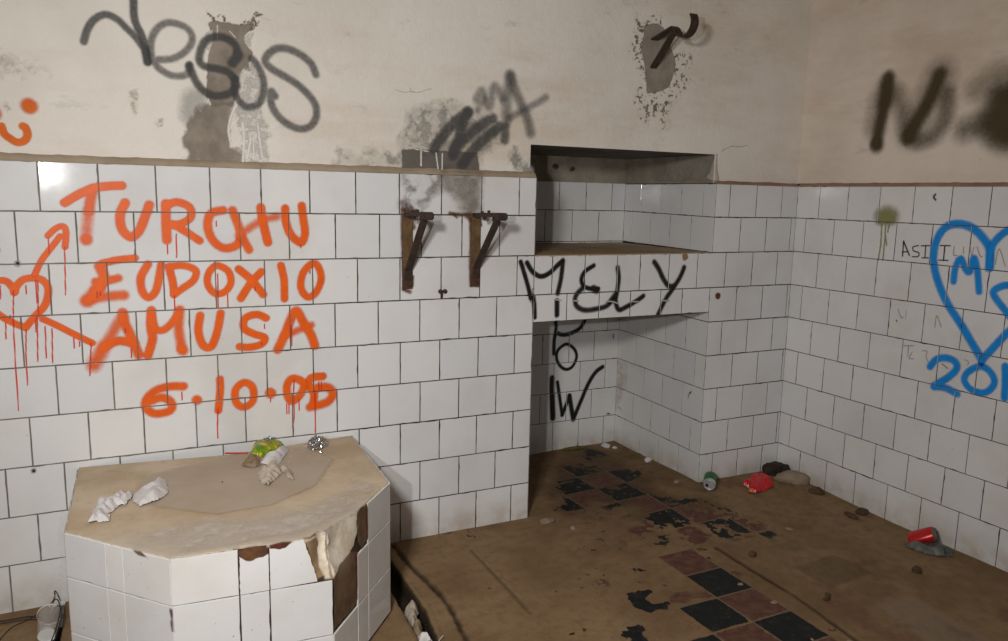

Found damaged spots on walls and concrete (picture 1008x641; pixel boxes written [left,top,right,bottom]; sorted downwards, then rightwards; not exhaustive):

peeling [183,12,262,162]
spalling [632,15,692,124]
rust [401,203,416,245]
rust [449,212,482,287]
spalling [238,504,368,630]